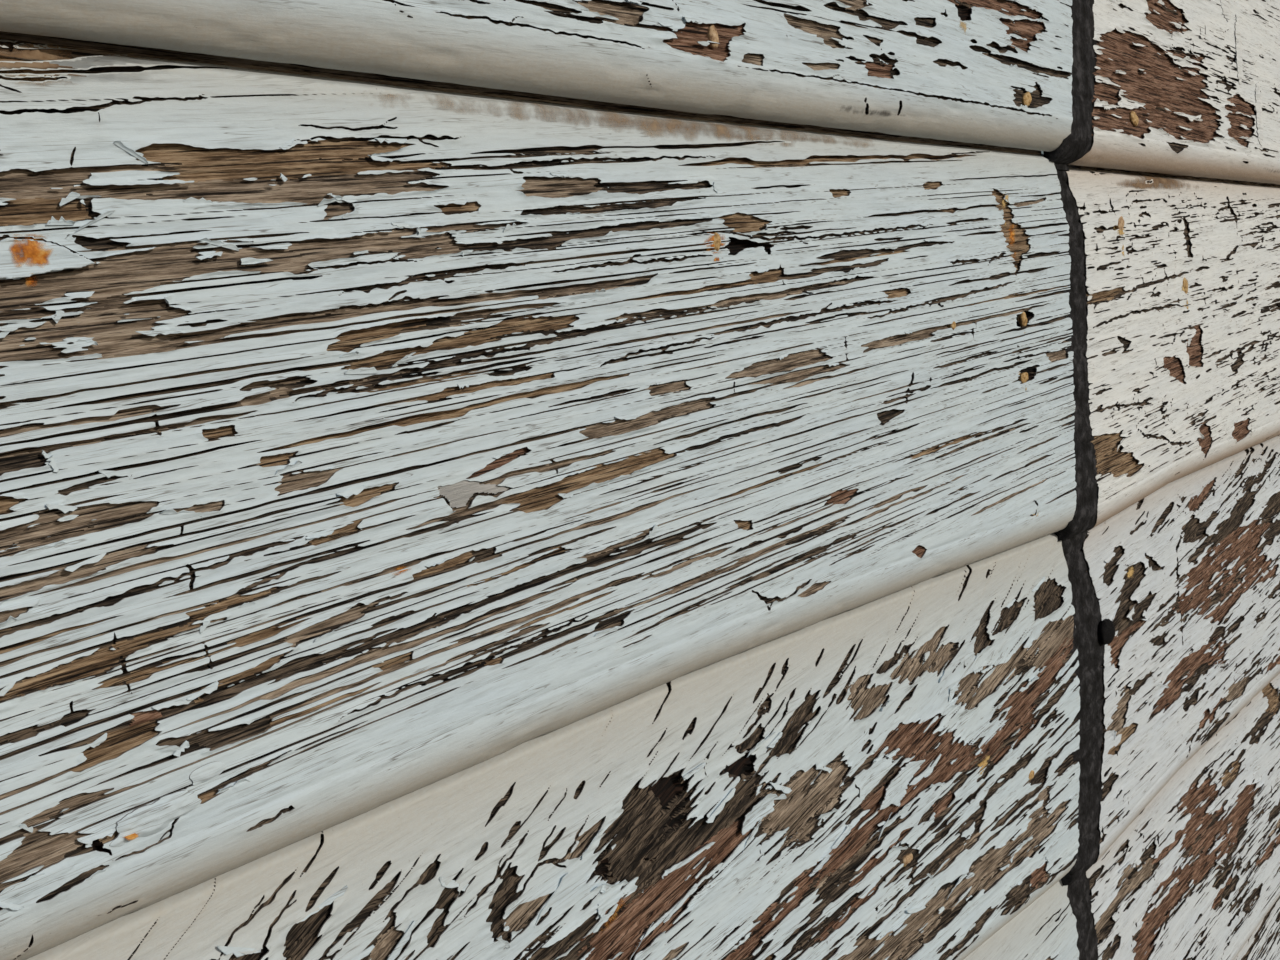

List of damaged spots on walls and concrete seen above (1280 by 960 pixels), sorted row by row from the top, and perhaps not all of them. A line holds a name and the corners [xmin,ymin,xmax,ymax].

peeling [520,0,764,66]
crack [738,0,1069,119]
peeling [1092,0,1256,154]
corrosion [11,235,51,285]
peeling [69,602,379,772]
crack [318,774,666,960]
crack [0,117,1074,860]
peeling [486,757,849,960]
crack [642,580,1079,960]
peeling [724,577,1074,960]
crack [1078,186,1280,960]
peeling [1151,473,1280,717]